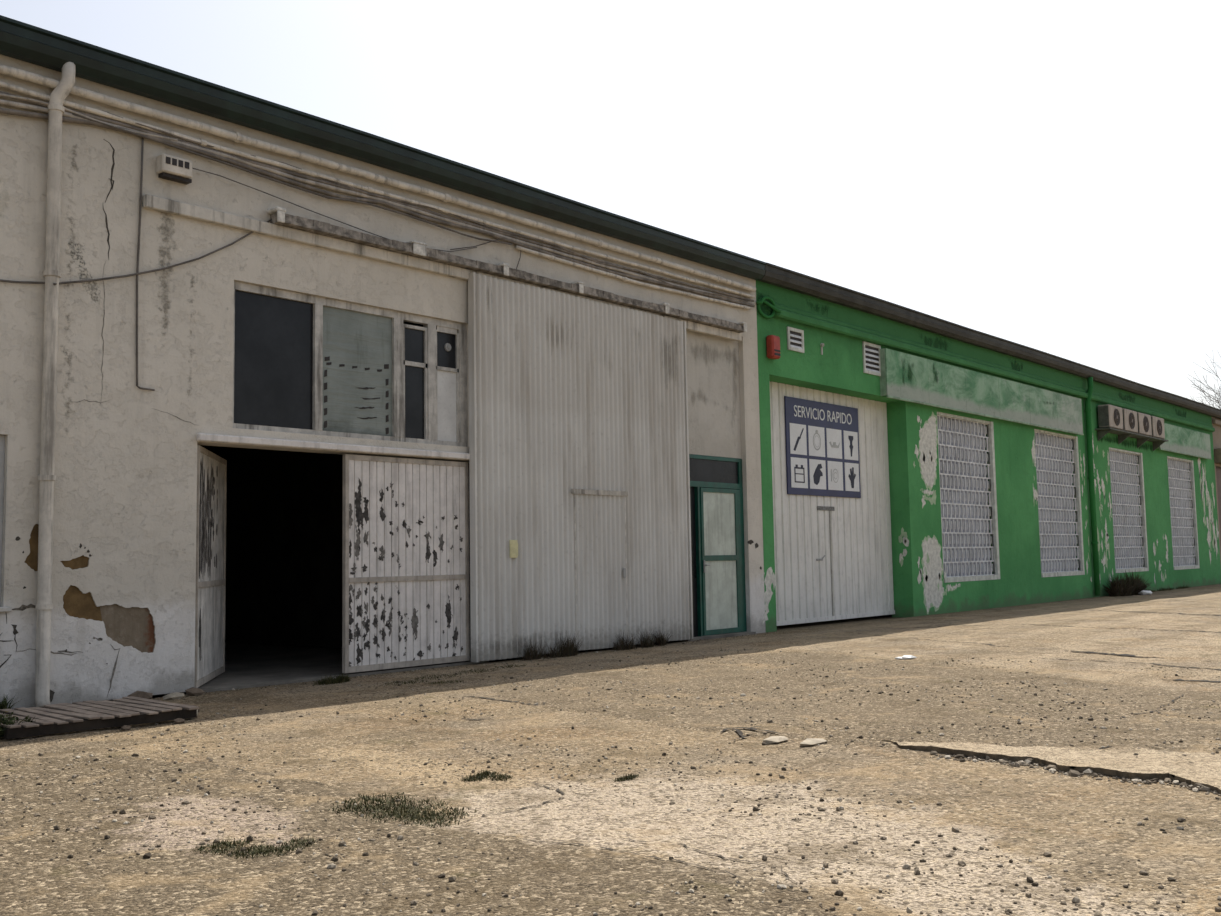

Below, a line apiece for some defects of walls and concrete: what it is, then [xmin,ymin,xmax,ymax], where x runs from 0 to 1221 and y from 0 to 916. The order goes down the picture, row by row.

crack [79,139,115,404]
peeling [913,412,938,509]
peeling [11,604,36,635]
spalling [15,524,39,571]
spalling [60,543,92,570]
spalling [63,585,156,653]
peeling [199,459,218,576]
peeling [349,479,463,667]
peeling [899,527,961,614]
peeling [1080,440,1113,582]
peeling [1198,457,1219,564]